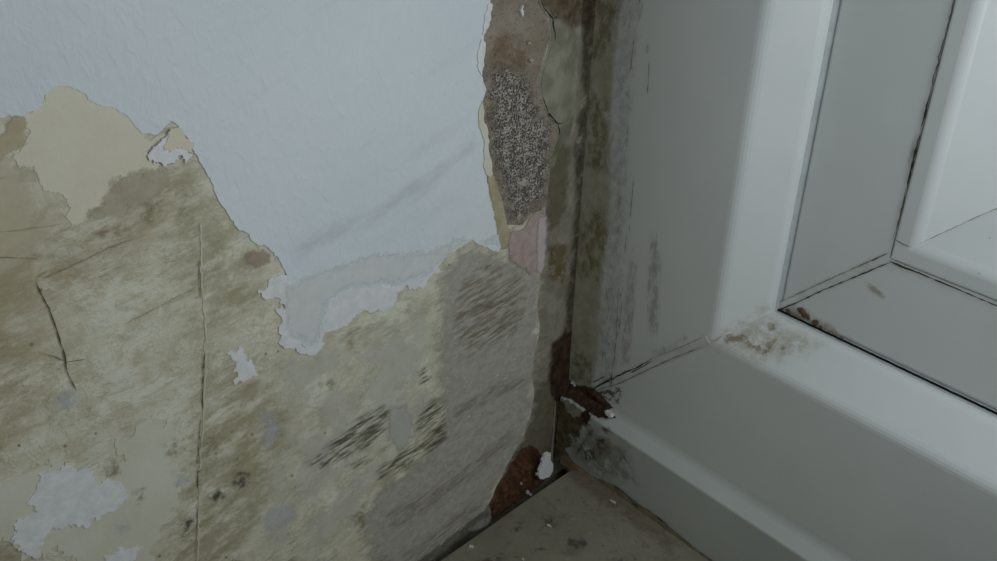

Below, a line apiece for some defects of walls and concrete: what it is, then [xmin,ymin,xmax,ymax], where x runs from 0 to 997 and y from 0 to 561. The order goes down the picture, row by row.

crack [36,271,84,391]
peeling [0,0,557,561]
corrosion [551,359,616,425]
damp [514,0,784,478]
damp [778,253,997,415]
damp [893,0,996,247]